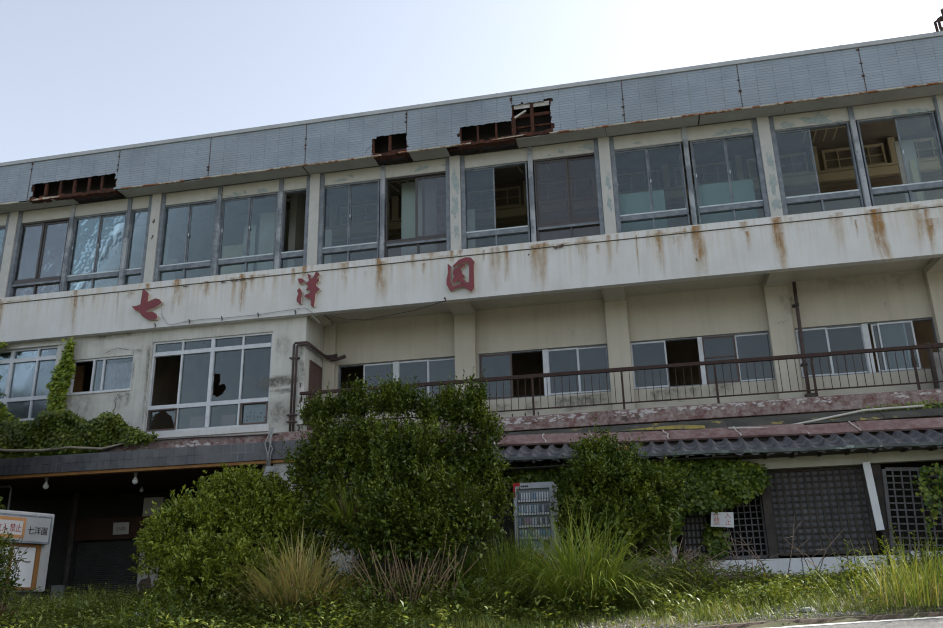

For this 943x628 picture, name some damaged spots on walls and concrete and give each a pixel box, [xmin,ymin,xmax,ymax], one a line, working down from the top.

corrosion [870,208,886,245]